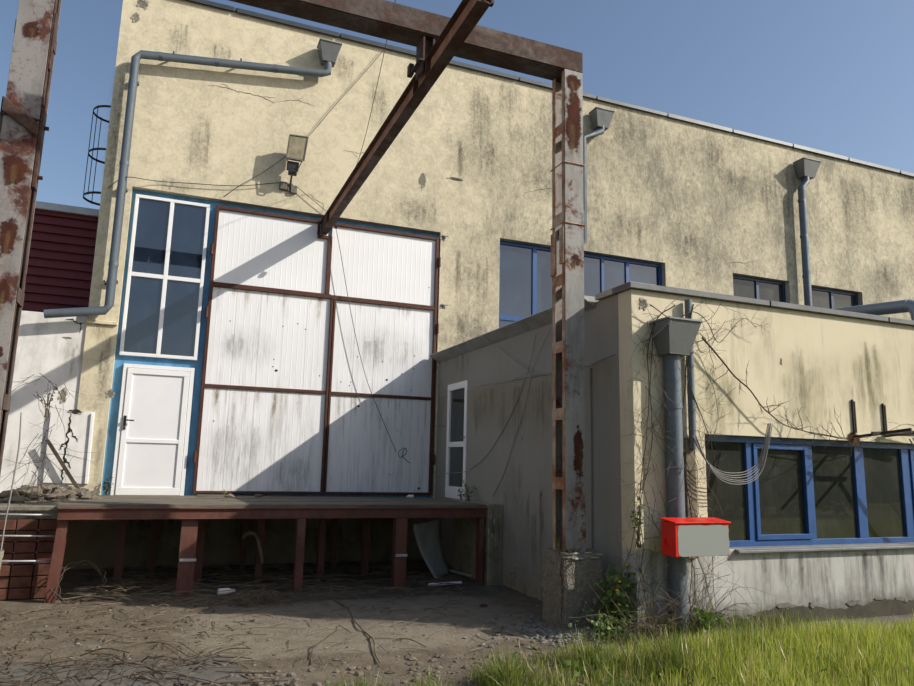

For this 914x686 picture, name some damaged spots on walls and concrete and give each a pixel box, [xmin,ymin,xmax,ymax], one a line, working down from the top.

rust [23,21,41,39]
crack [207,84,313,106]
rust [566,75,582,151]
rust [2,152,27,185]
rust [0,218,19,257]
rust [0,279,10,303]
crack [59,413,78,481]